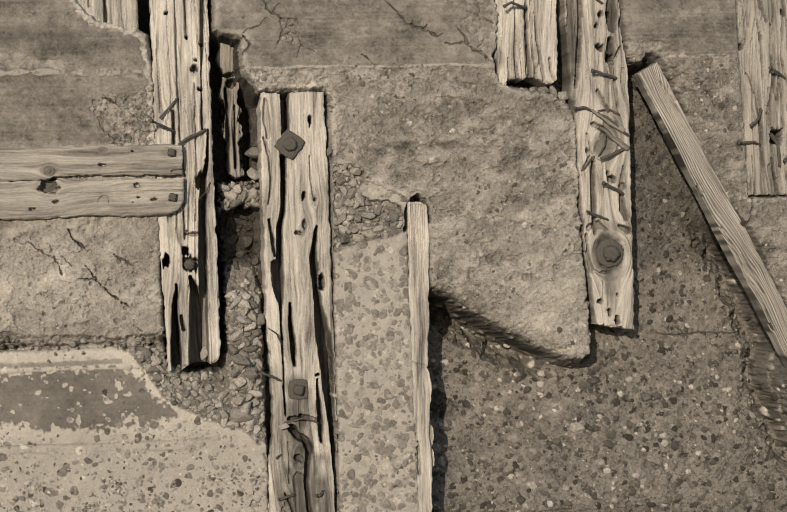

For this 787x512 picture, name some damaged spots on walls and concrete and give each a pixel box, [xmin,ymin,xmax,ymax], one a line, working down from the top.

crack [242,0,314,59]
crack [384,0,495,62]
spalling [90,84,156,146]
spalling [330,164,404,251]
crack [27,228,130,308]
crack [113,254,134,266]
peeling [0,180,266,442]